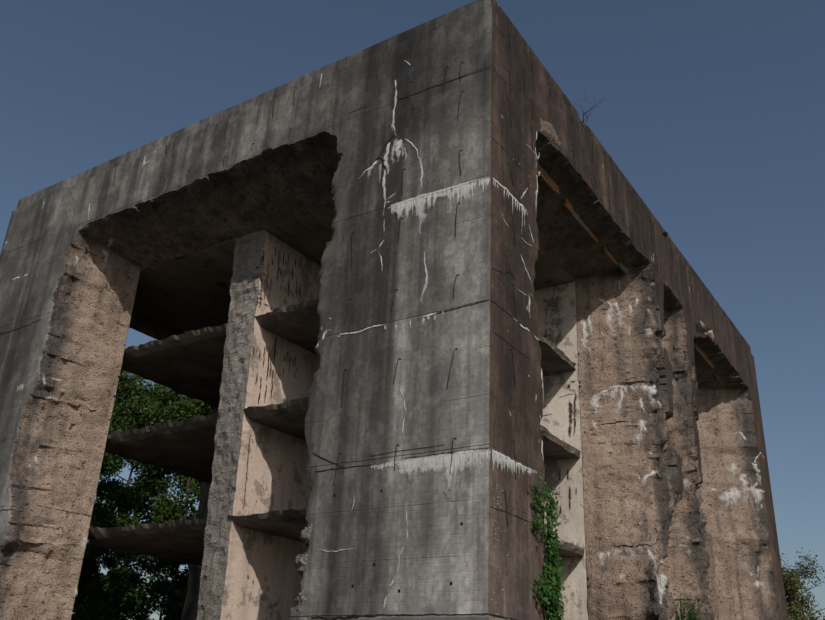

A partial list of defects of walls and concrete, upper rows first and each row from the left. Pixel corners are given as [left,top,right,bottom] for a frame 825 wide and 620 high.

crack [361,67,506,211]
water stain [363,160,528,232]
spalling [695,321,719,339]
water stain [593,385,661,410]
water stain [372,450,537,487]
water stain [711,456,764,508]